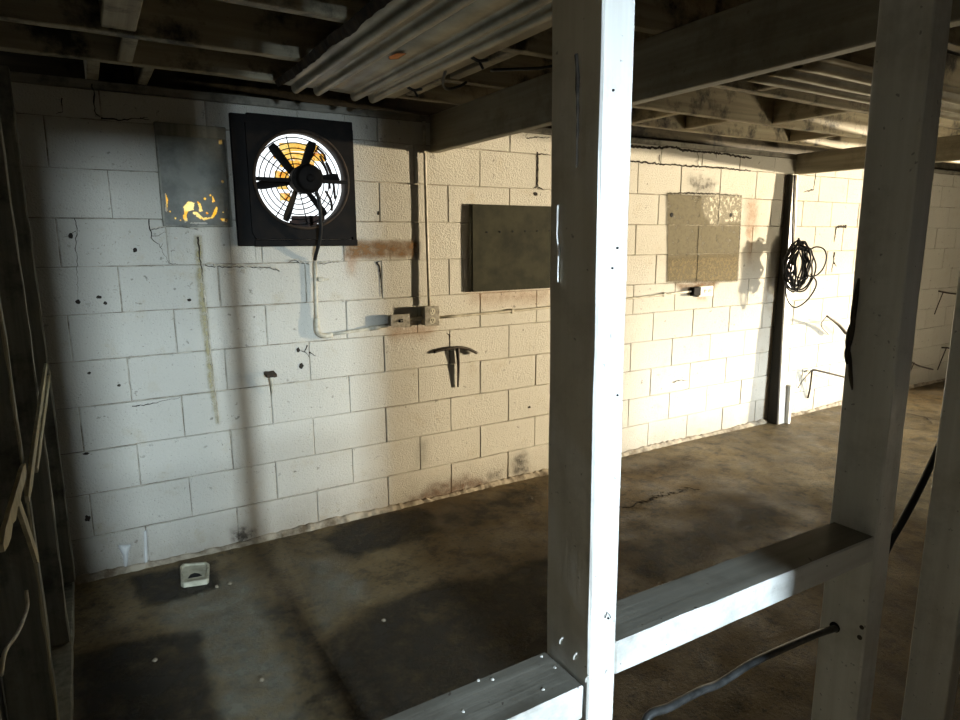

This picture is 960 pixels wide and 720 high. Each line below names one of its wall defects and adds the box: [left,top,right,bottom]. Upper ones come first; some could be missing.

crack [631,145,752,172]
corrosion [347,241,419,257]
crack [622,488,700,508]